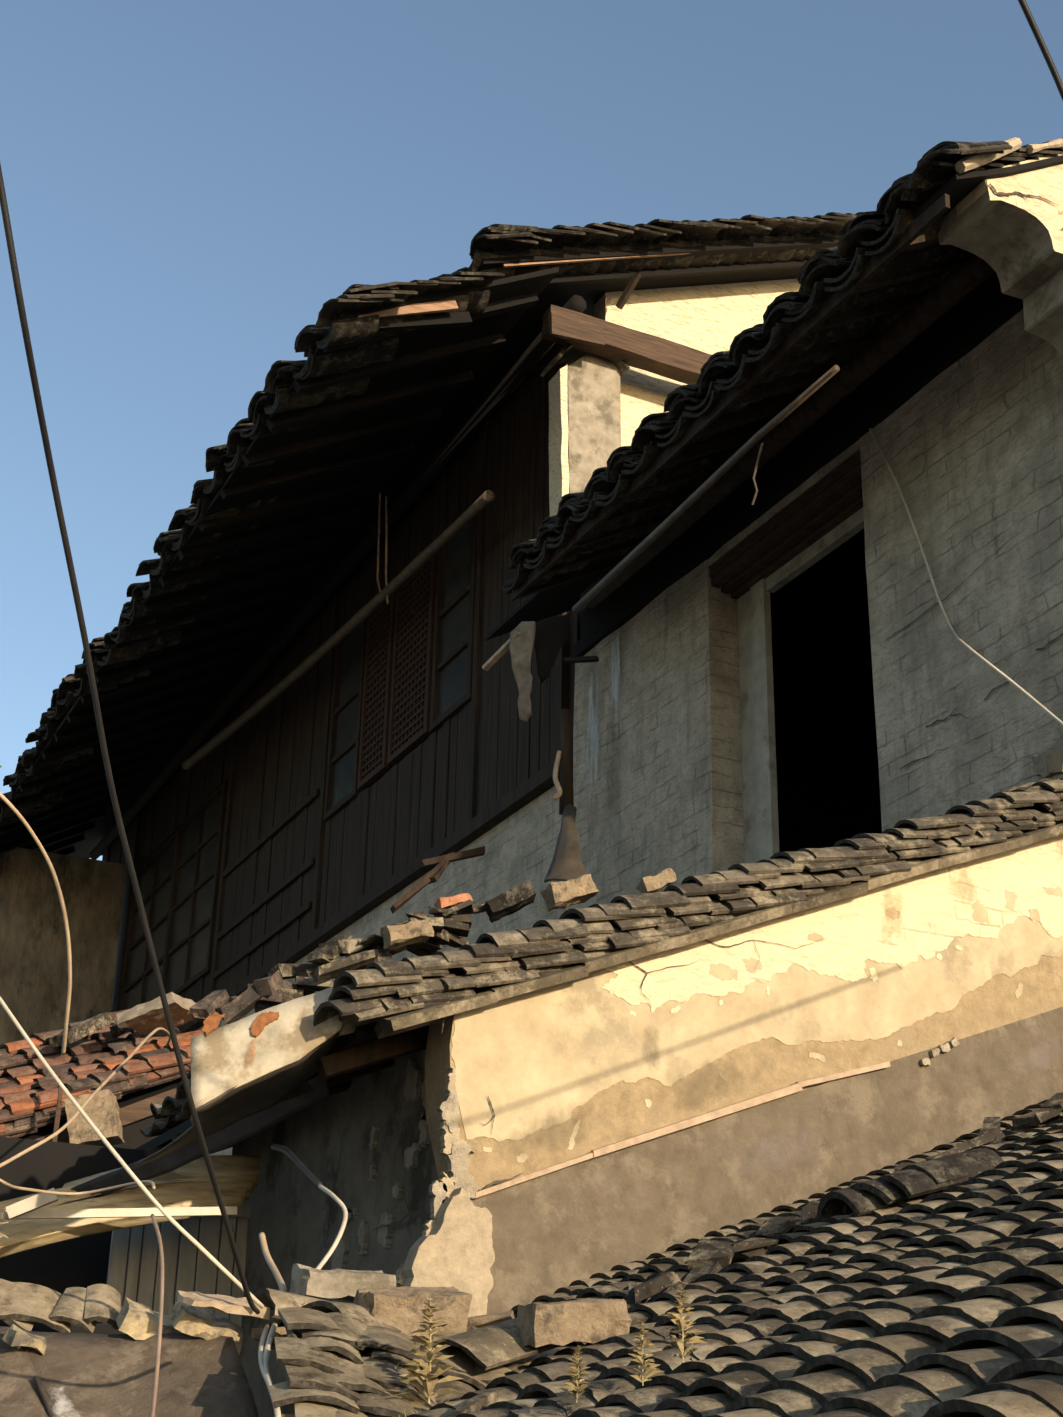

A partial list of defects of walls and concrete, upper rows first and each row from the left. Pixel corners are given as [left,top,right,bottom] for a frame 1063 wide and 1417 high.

crack [900,633,1063,769]
flaking render [331,835,1063,1270]
spalling [396,1262,405,1287]